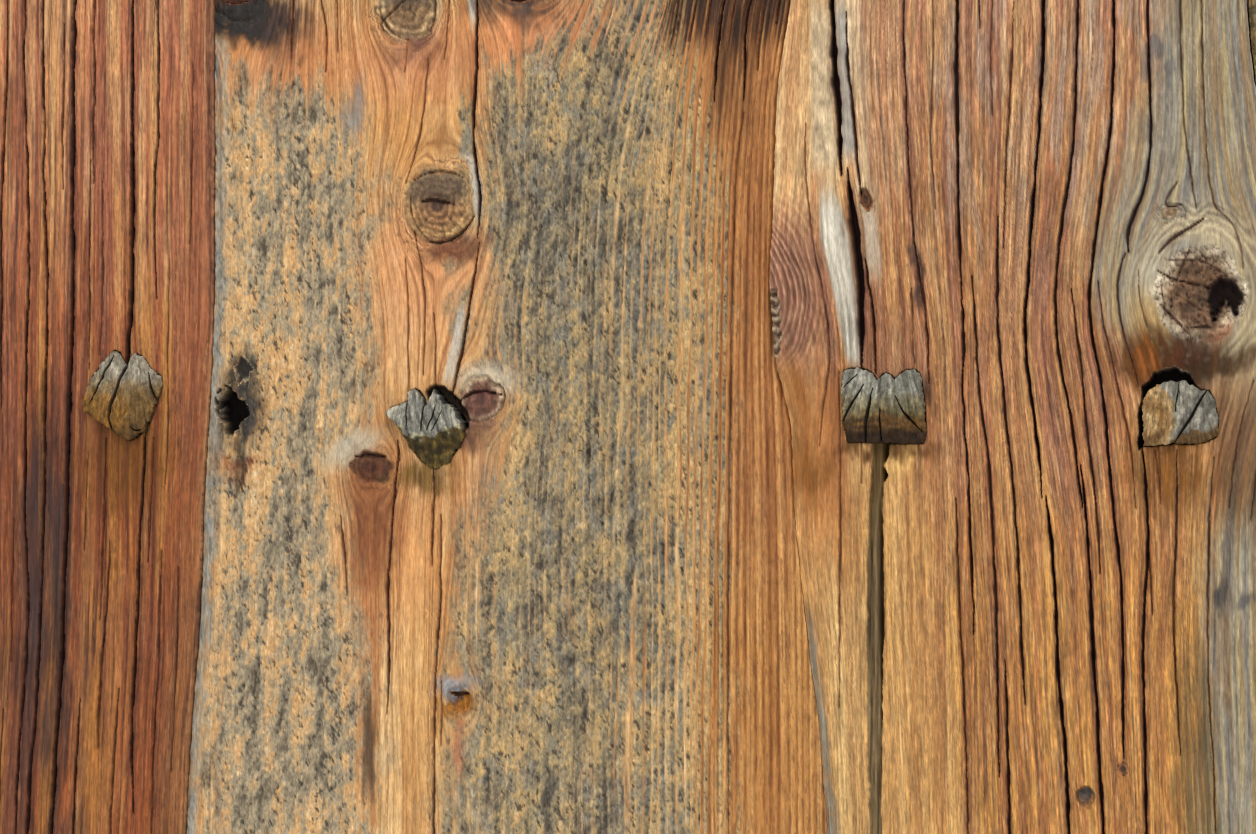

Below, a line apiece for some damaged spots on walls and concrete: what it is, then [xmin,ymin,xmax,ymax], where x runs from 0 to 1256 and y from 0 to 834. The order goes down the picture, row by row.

crack [355,0,502,714]
crack [431,468,469,834]
crack [669,0,781,834]
crack [804,0,923,834]
crack [901,0,1256,834]